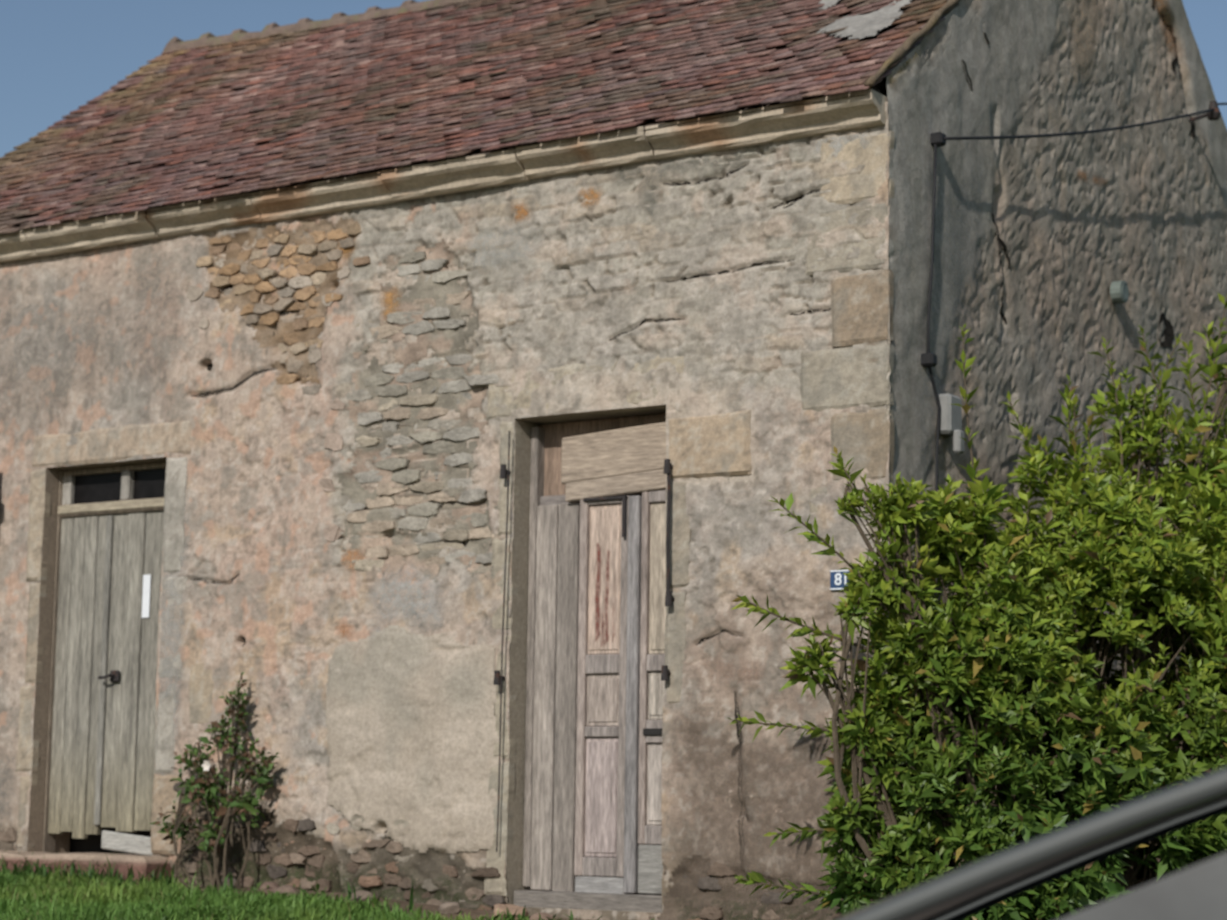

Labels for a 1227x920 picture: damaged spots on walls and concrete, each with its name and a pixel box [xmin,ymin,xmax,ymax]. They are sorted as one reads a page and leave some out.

peeling [816,0,911,40]
crack [992,207,1010,325]
crack [246,310,299,336]
flaking render [187,220,371,395]
flaking render [369,251,470,339]
crack [190,363,309,397]
crack [191,574,239,584]